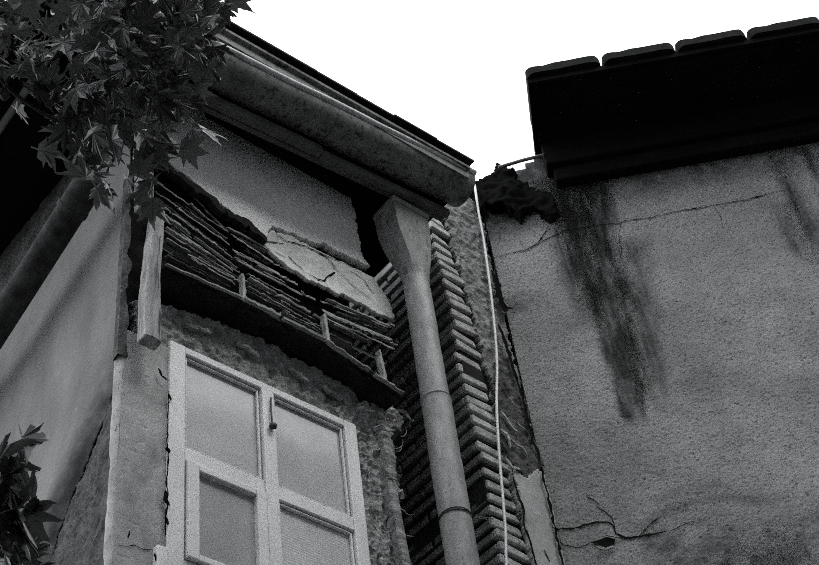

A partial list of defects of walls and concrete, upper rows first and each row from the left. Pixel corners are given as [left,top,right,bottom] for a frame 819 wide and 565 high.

flaking render [161,163,268,245]
leakage [555,180,652,418]
crack [491,188,794,565]